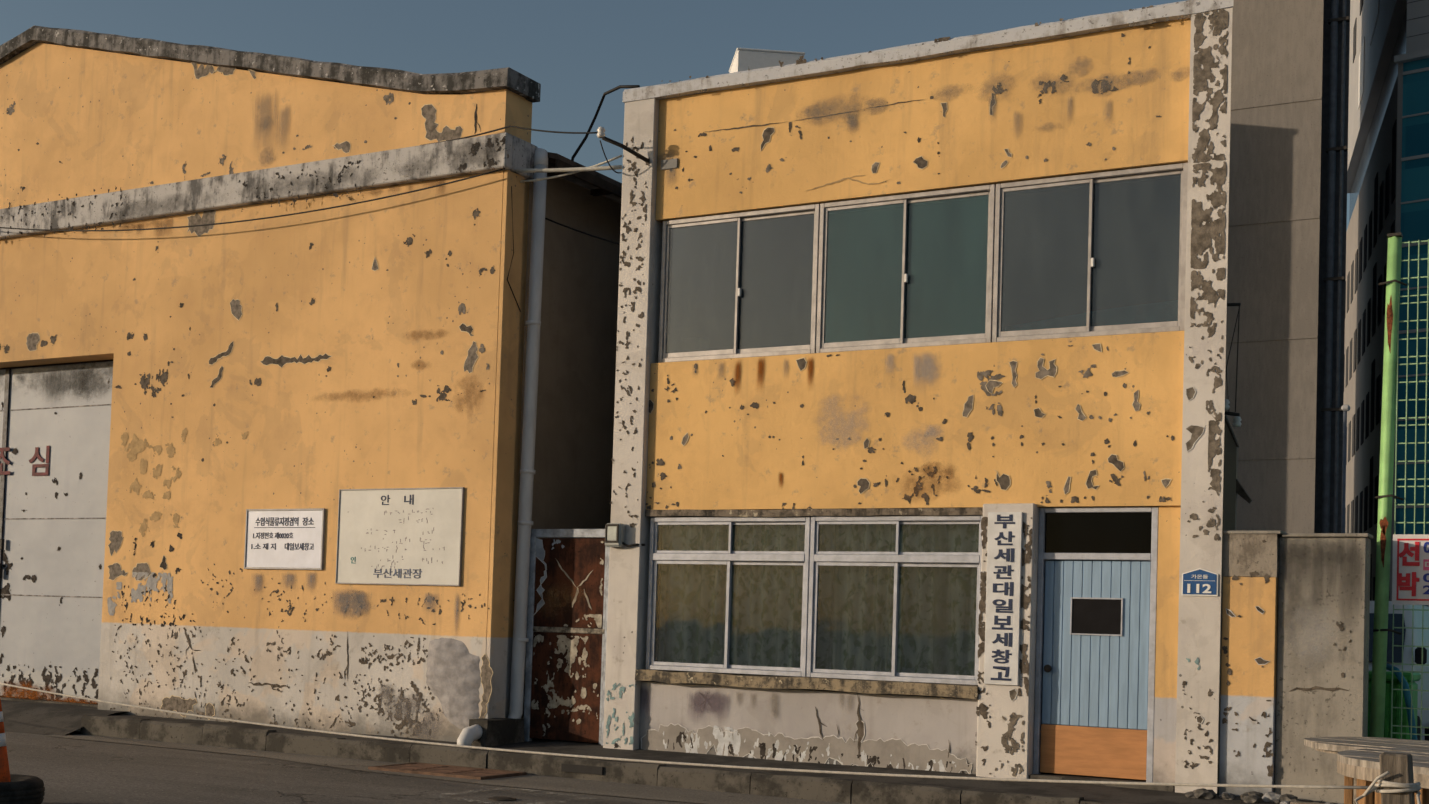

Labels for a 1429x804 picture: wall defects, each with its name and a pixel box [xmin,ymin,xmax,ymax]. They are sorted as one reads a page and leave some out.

spalling [1091,76,1118,94]
spalling [729,122,802,194]
peeling [1,186,126,239]
spalling [187,210,216,237]
peeling [615,137,678,451]
peeling [1121,0,1229,541]
spalling [796,357,807,371]
peeling [902,381,935,411]
spalling [1033,343,1150,422]
peeling [0,341,489,740]
spalling [531,436,1125,776]